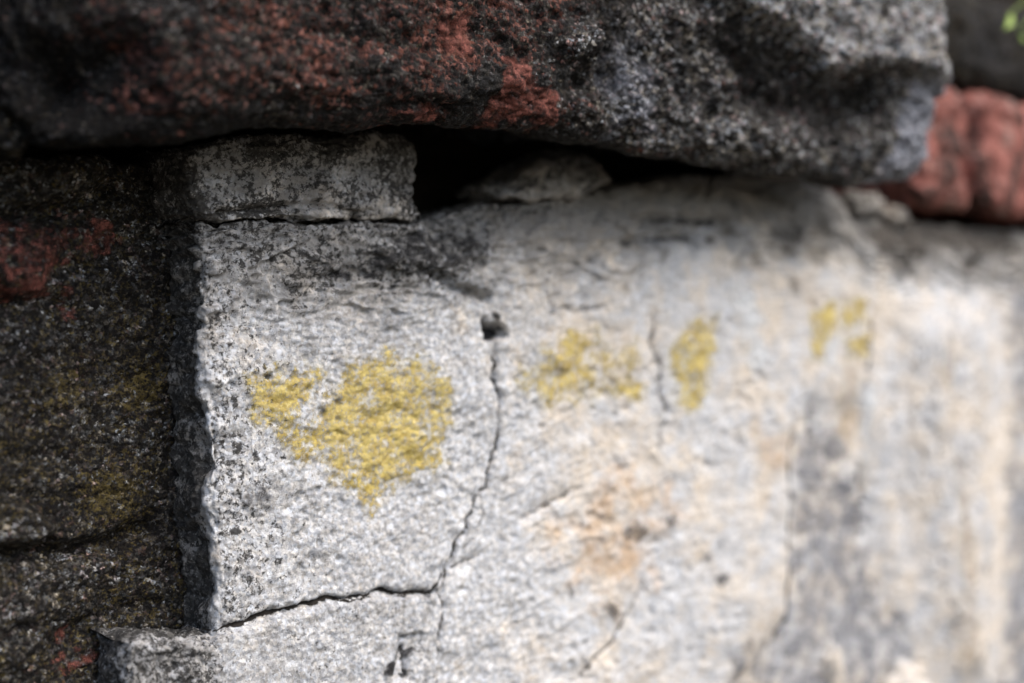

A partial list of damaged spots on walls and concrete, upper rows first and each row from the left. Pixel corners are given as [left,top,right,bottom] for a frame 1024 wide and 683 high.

crack [202,355,500,681]